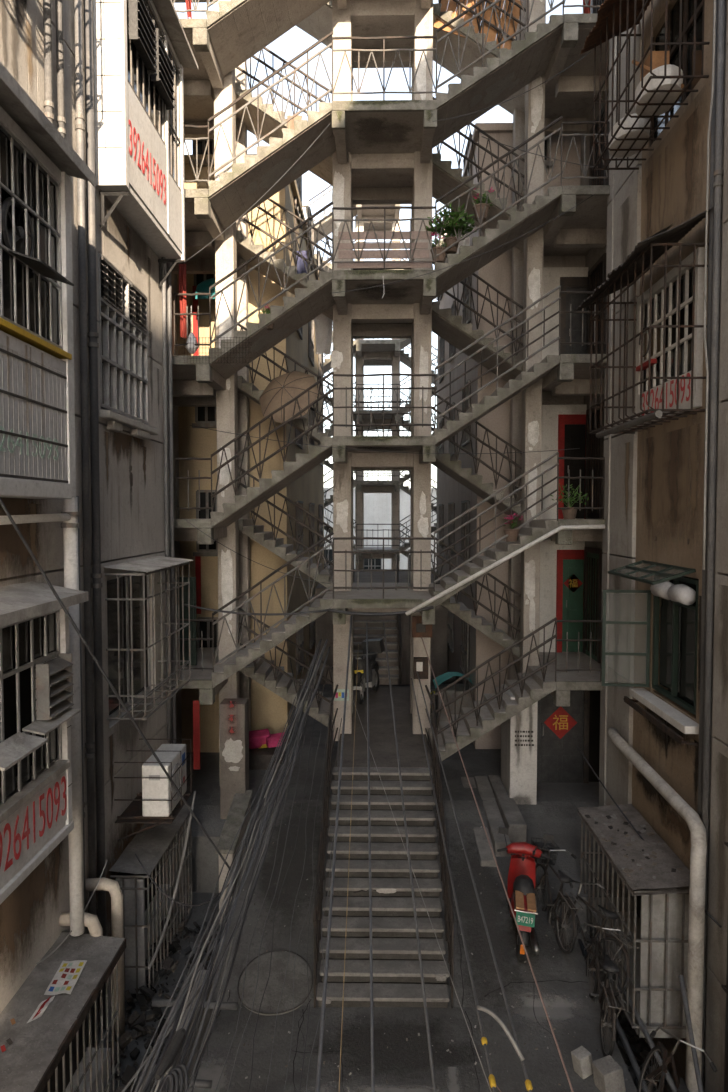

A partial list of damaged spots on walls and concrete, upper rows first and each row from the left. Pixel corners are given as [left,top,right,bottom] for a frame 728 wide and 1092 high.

damp [621,198,629,263]
damp [105,430,146,502]
damp [645,414,698,539]
damp [0,497,41,575]